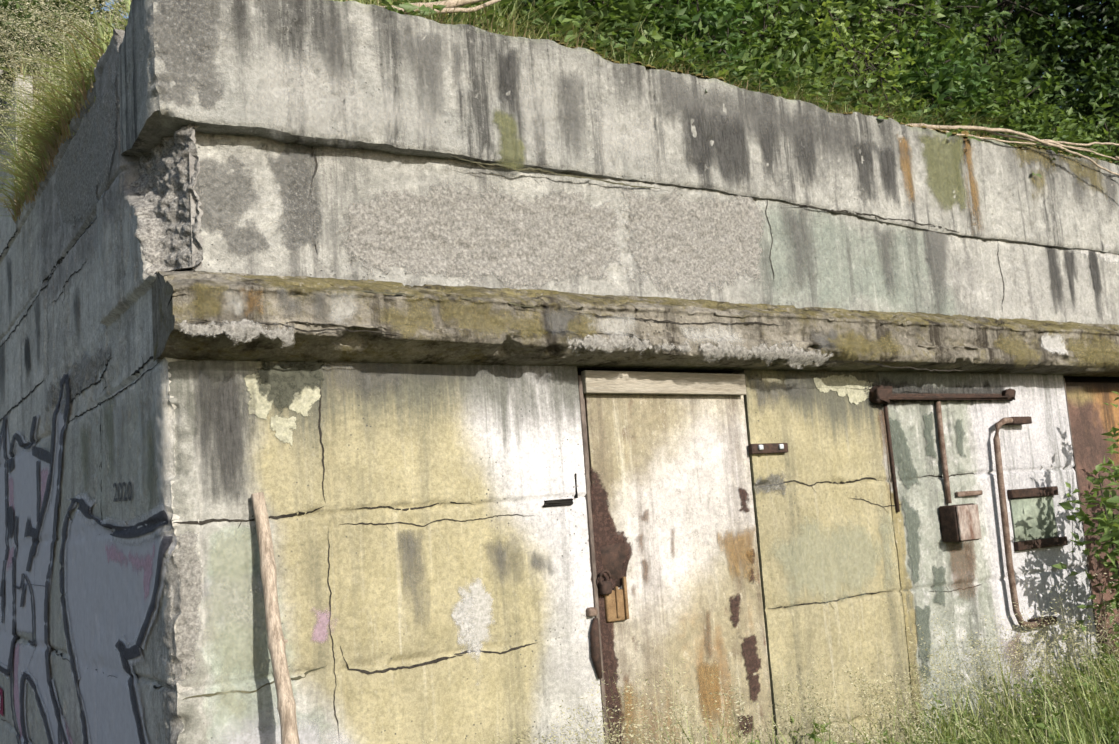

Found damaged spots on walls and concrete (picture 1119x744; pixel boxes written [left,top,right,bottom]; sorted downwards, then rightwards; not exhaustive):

spalling [130,125,322,275]
spalling [339,182,765,299]
leakage [663,80,897,201]
crack [0,222,93,422]
leakage [196,373,247,497]
peeling [178,319,324,445]
spalling [568,334,874,405]
rust [738,488,750,512]
crack [780,476,900,510]
crack [153,387,536,744]
rust [589,468,634,744]
rust [742,635,762,702]